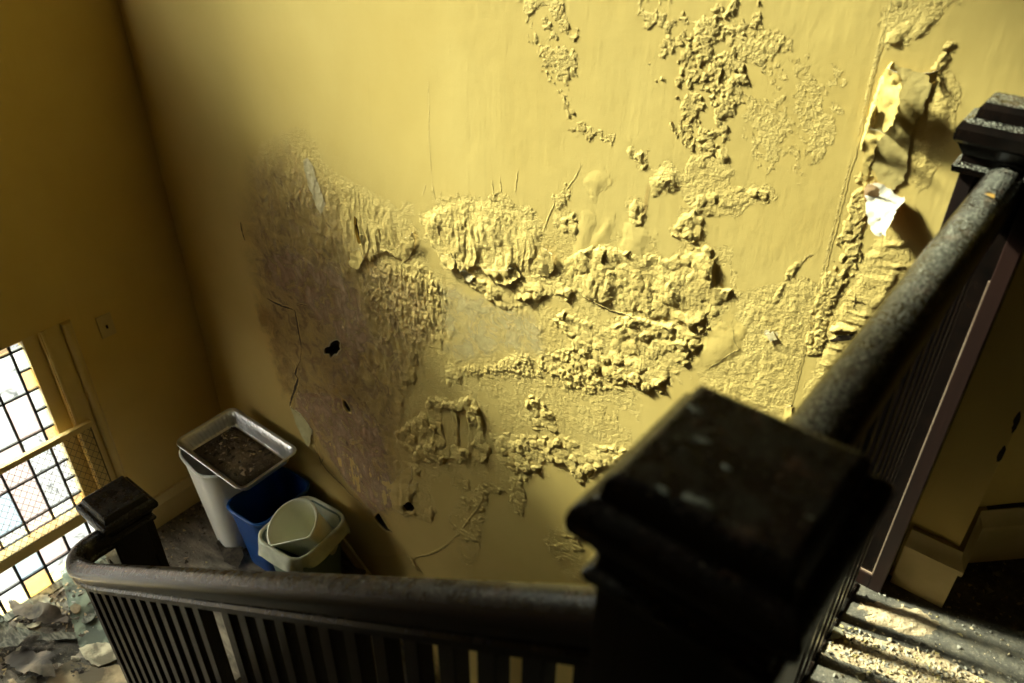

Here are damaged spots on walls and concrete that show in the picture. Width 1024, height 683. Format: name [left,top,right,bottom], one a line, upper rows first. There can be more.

peeling [518,0,615,146]
peeling [635,0,847,219]
peeling [623,195,648,227]
peeling [696,0,960,420]
crack [267,298,309,413]
leakage [257,173,418,431]
peeling [498,473,530,518]